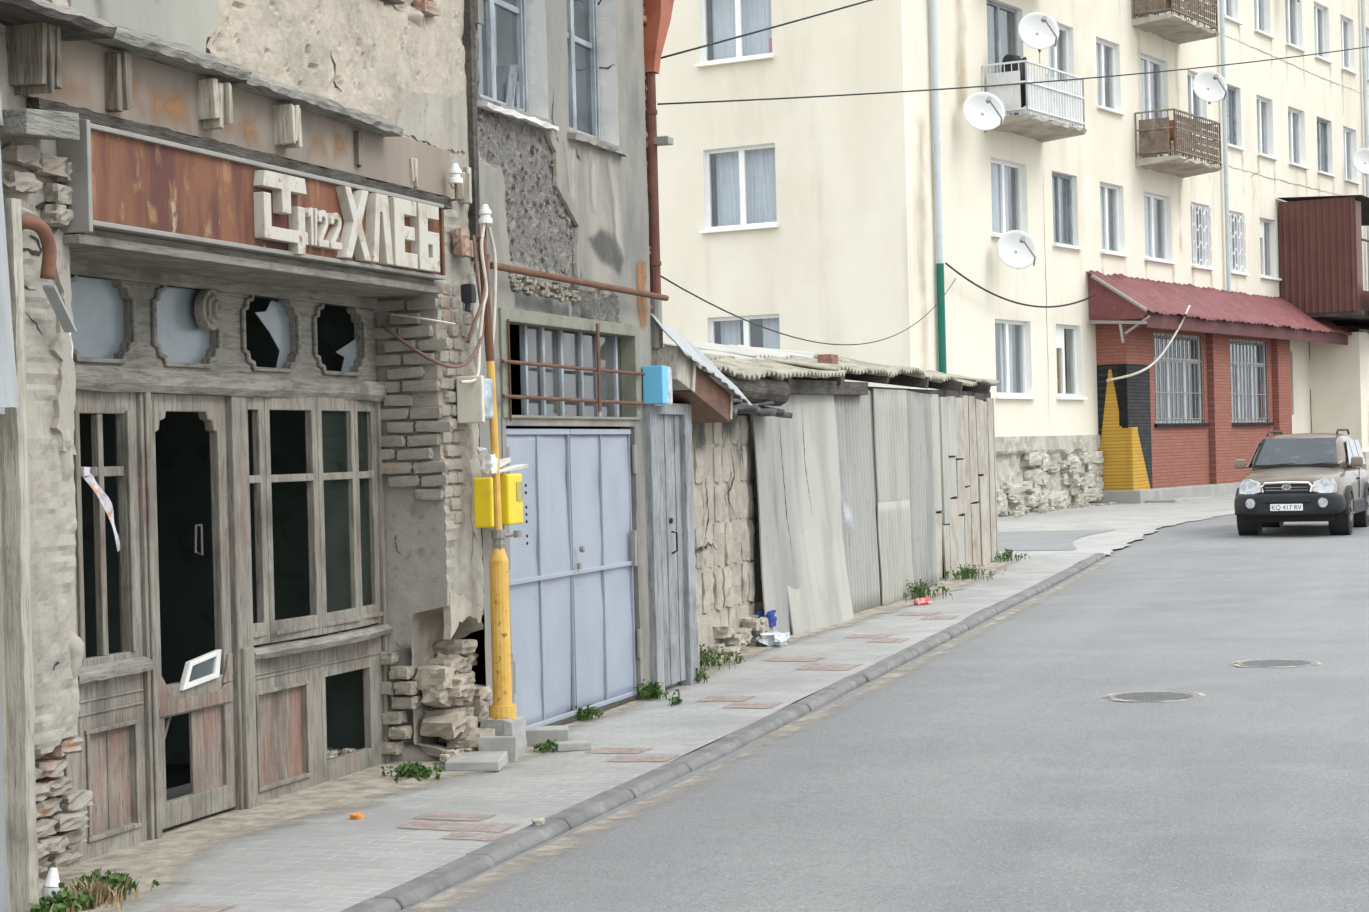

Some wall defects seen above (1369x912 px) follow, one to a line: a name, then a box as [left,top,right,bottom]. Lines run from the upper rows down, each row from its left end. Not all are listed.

spalling [386,0,441,17]
flaking render [394,90,585,302]
corrosion [637,263,647,326]
spalling [373,283,473,524]
spalling [379,592,496,764]
spalling [35,736,94,898]